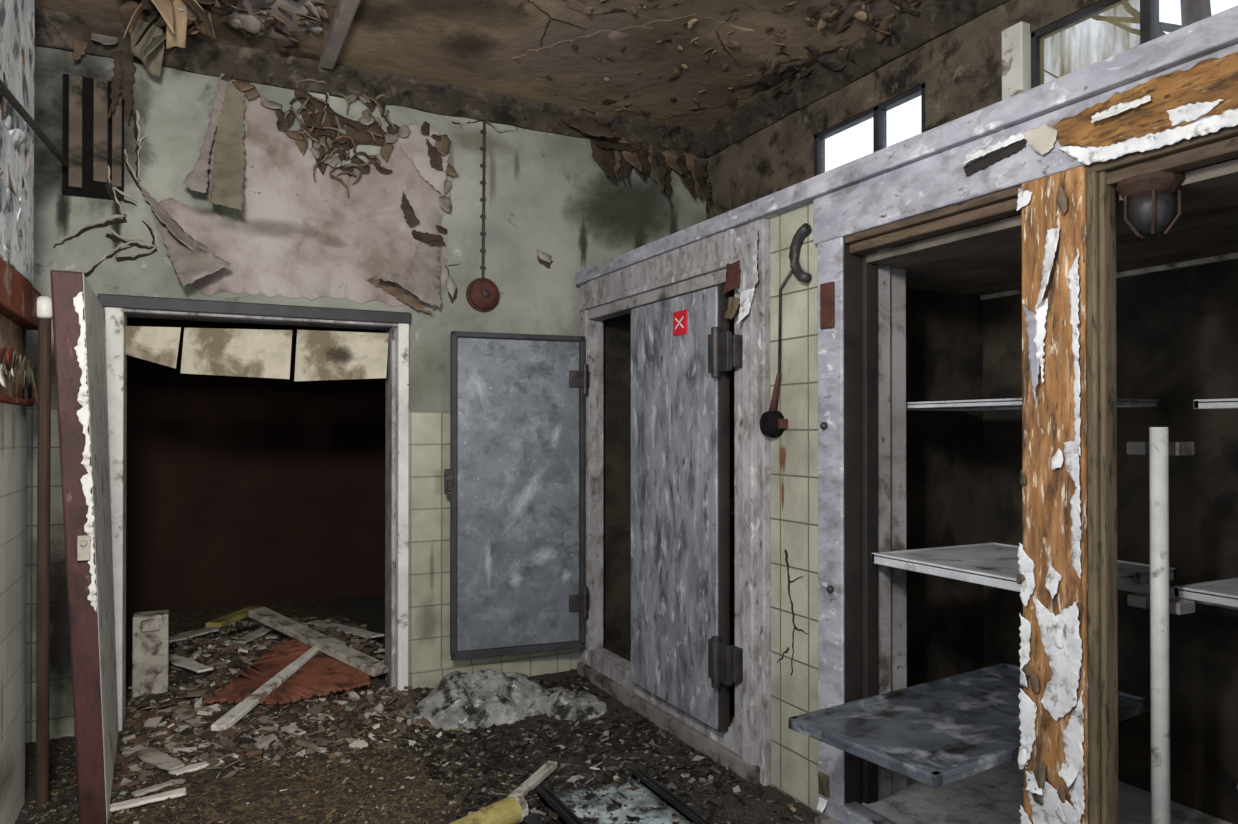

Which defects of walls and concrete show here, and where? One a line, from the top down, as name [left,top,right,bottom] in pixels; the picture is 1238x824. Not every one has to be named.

peeling [0,93,30,238]
peeling [71,0,328,122]
peeling [138,73,458,314]
crack [527,0,586,47]
peeling [1016,188,1033,211]
peeling [963,52,1238,177]
peeling [1023,185,1067,400]
peeling [1016,253,1085,824]